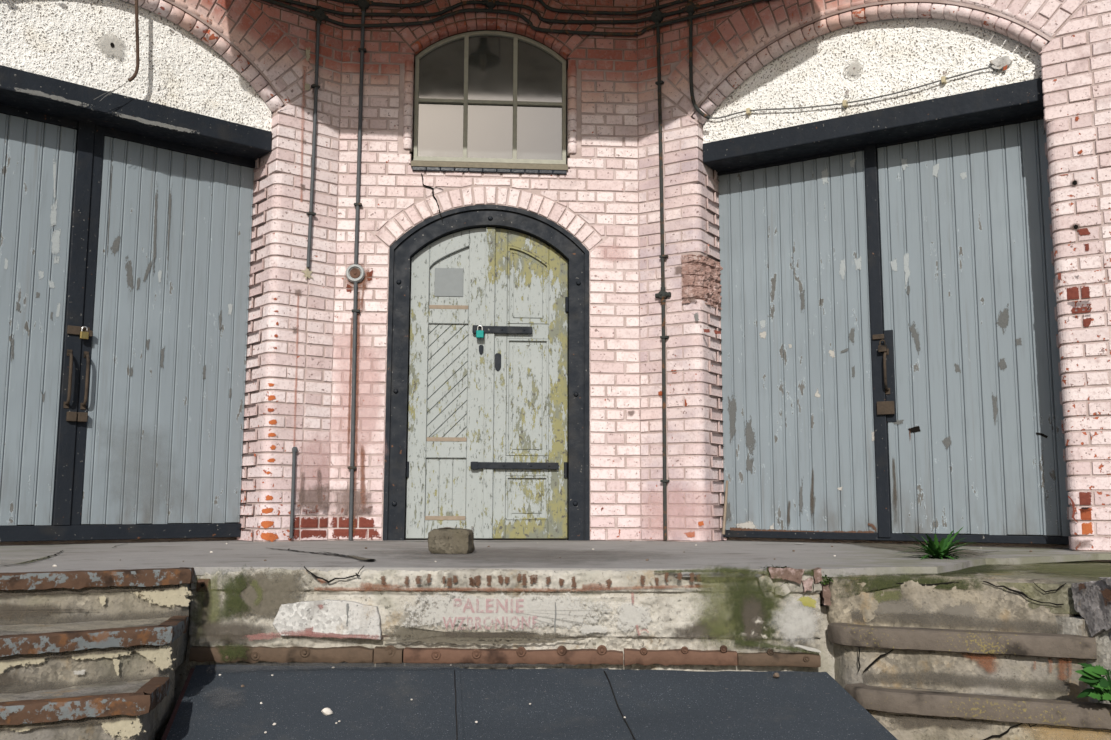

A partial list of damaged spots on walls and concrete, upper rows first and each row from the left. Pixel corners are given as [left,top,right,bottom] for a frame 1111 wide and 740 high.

crack [421,173,443,220]
spalling [675,254,723,334]
peeling [728,392,757,474]
crack [271,548,376,583]
peeling [133,585,192,608]
peeling [235,567,652,645]
crack [896,581,1066,605]
water stain [675,617,733,637]
peeling [0,652,51,673]
peeling [65,646,175,676]
peeling [101,715,146,740]
crack [983,723,1037,740]